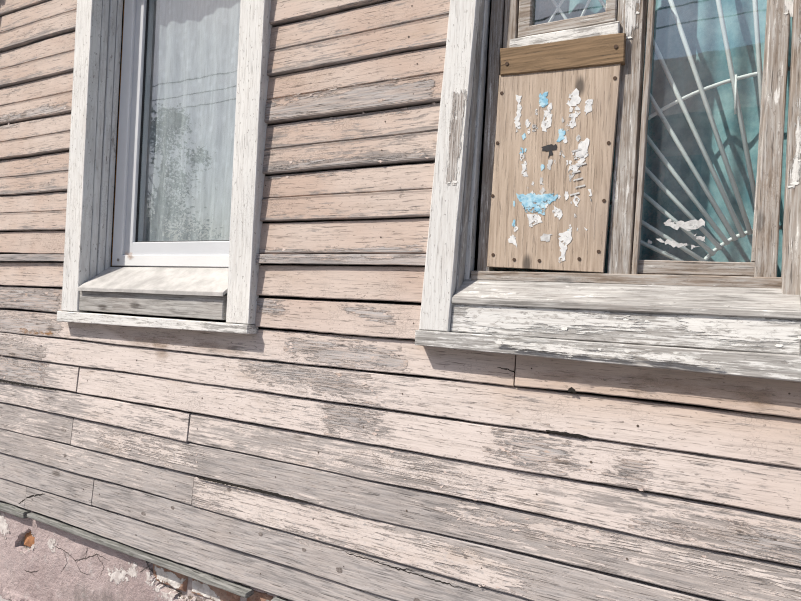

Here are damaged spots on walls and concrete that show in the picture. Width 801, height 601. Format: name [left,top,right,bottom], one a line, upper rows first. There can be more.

peeling [784,0,800,17]
peeling [787,98,801,189]
peeling [452,303,723,371]
peeling [676,314,801,350]
peeling [238,336,801,600]
spalling [0,513,10,539]
spalling [17,531,35,554]
crack [53,545,110,574]
peeling [97,429,534,601]
crack [340,550,472,592]